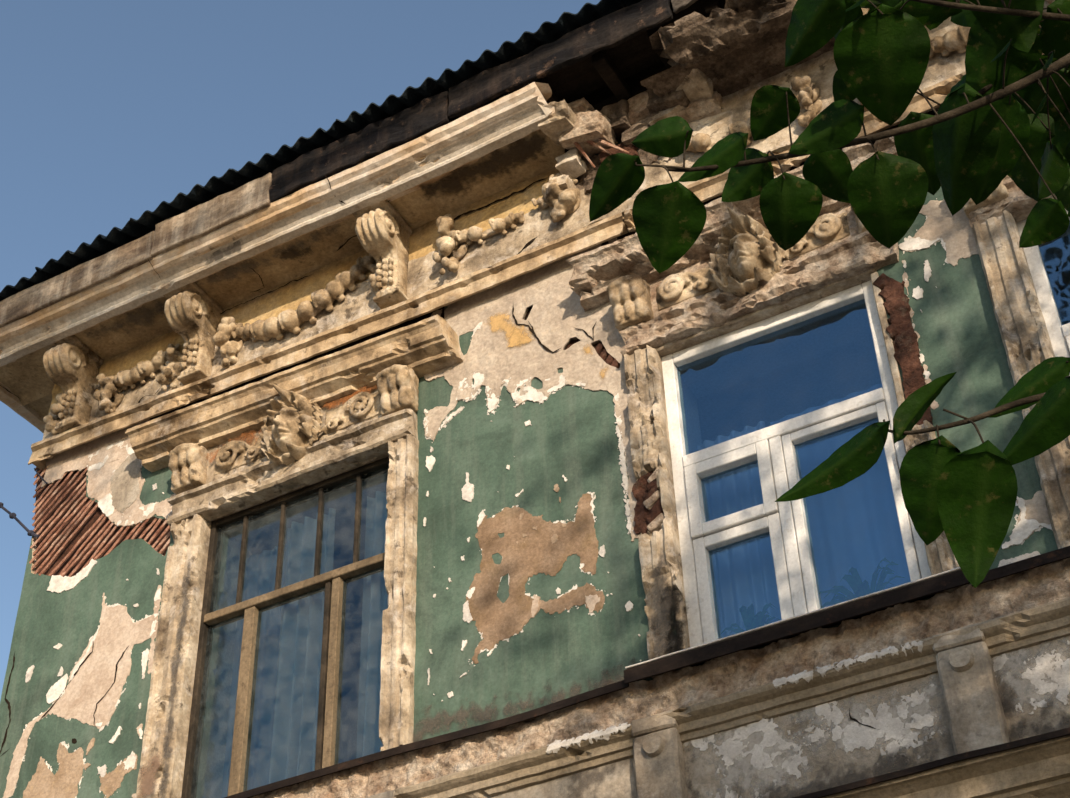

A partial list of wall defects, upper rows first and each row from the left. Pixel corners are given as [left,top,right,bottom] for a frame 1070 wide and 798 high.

damp [420,133,547,200]
crack [454,179,545,220]
crack [512,307,597,353]
peeling [873,198,979,399]
peeling [423,259,664,542]
flaking render [917,400,939,425]
peeling [41,419,176,527]
peeling [460,489,613,678]
crack [0,653,15,756]
peeling [3,568,162,798]
peeling [684,676,941,798]
peeling [993,640,1070,715]